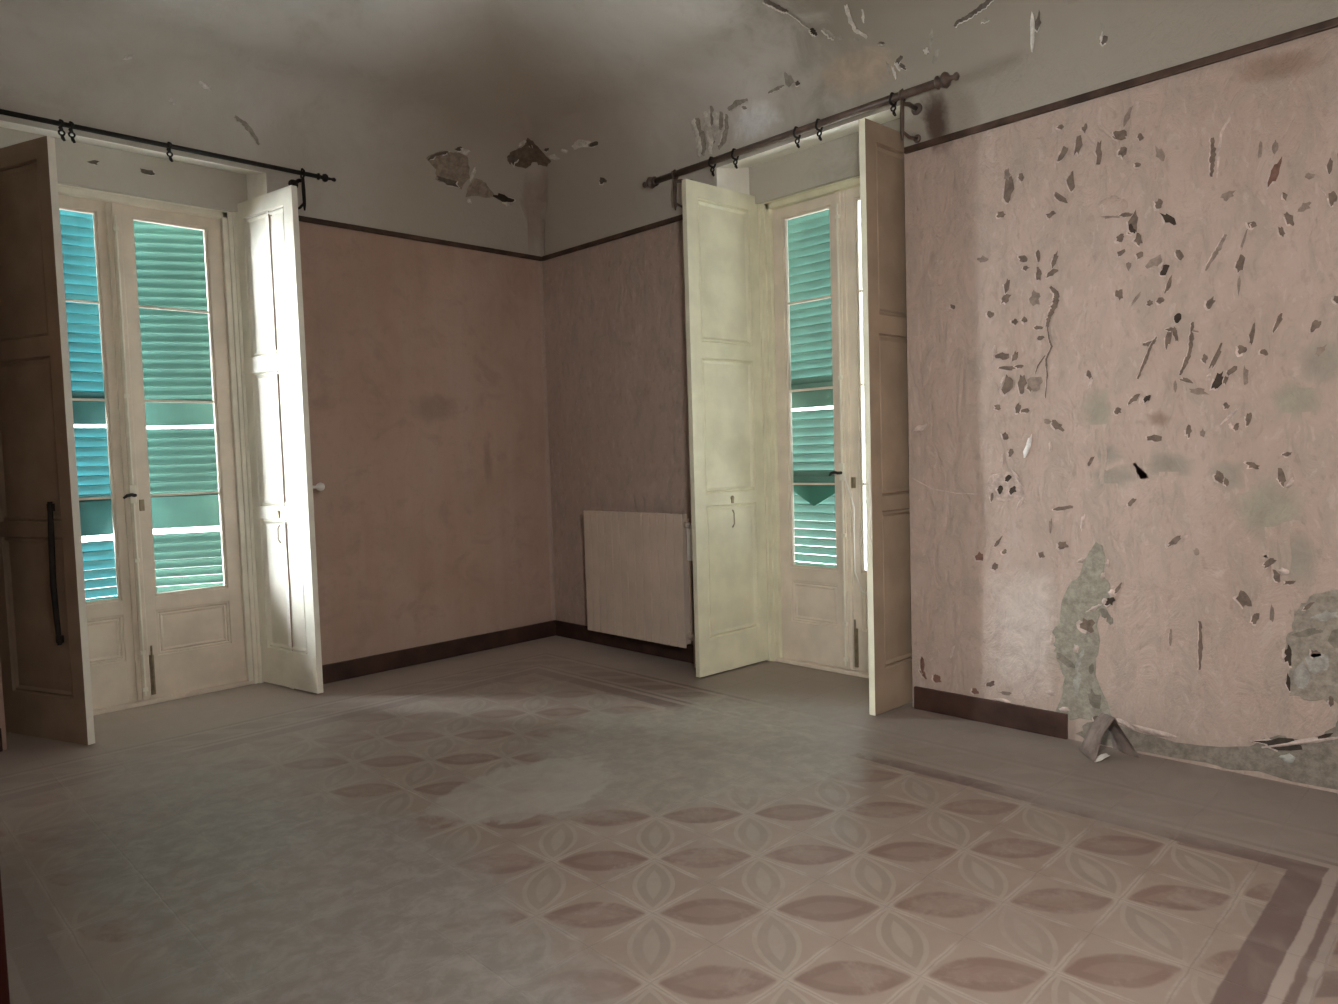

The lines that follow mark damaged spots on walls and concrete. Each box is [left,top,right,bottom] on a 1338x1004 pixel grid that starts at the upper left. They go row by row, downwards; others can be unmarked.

spalling [426,146,516,207]
peeling [995,168,1024,219]
peeling [1044,106,1165,220]
peeling [1153,198,1176,225]
peeling [1258,139,1338,237]
peeling [985,255,1029,320]
peeling [1113,210,1184,307]
peeling [1164,313,1181,350]
peeling [992,345,1043,415]
peeling [1174,322,1268,432]
spalling [985,432,1032,508]
spalling [970,505,1338,790]